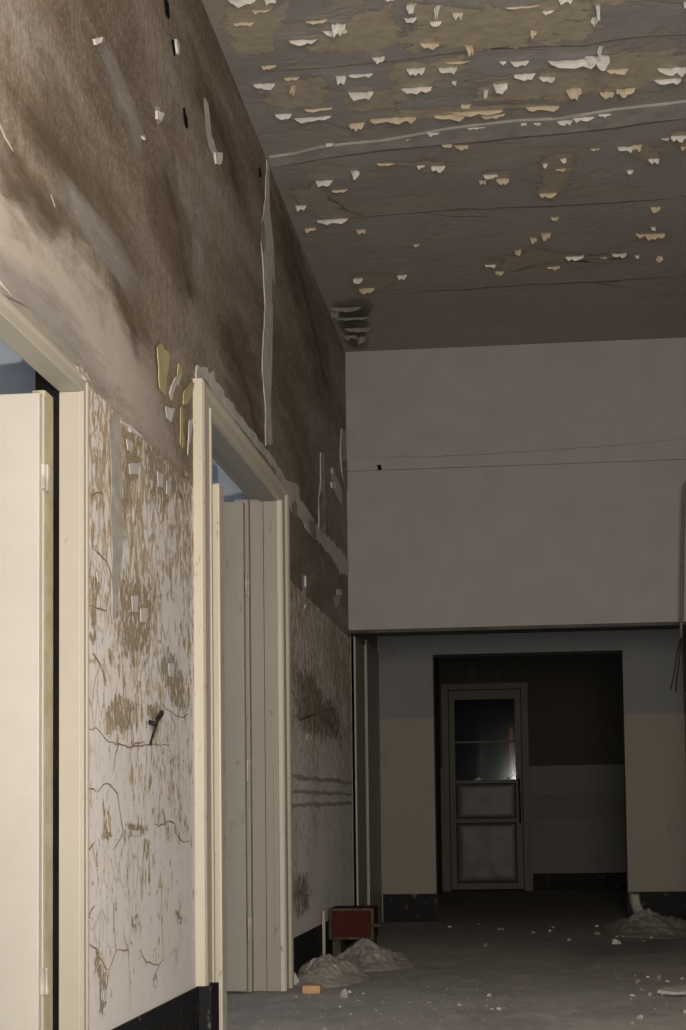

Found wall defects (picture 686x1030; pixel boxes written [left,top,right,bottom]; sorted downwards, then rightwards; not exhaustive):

peeling [220,0,686,131]
spalling [202,94,223,165]
peeling [288,170,366,234]
peeling [376,161,448,173]
crack [279,119,686,218]
peeling [482,217,639,276]
peeling [617,130,686,164]
peeling [121,335,195,535]
peeling [90,563,101,646]
peeling [103,569,190,736]
crack [89,702,189,862]
crack [89,872,164,990]